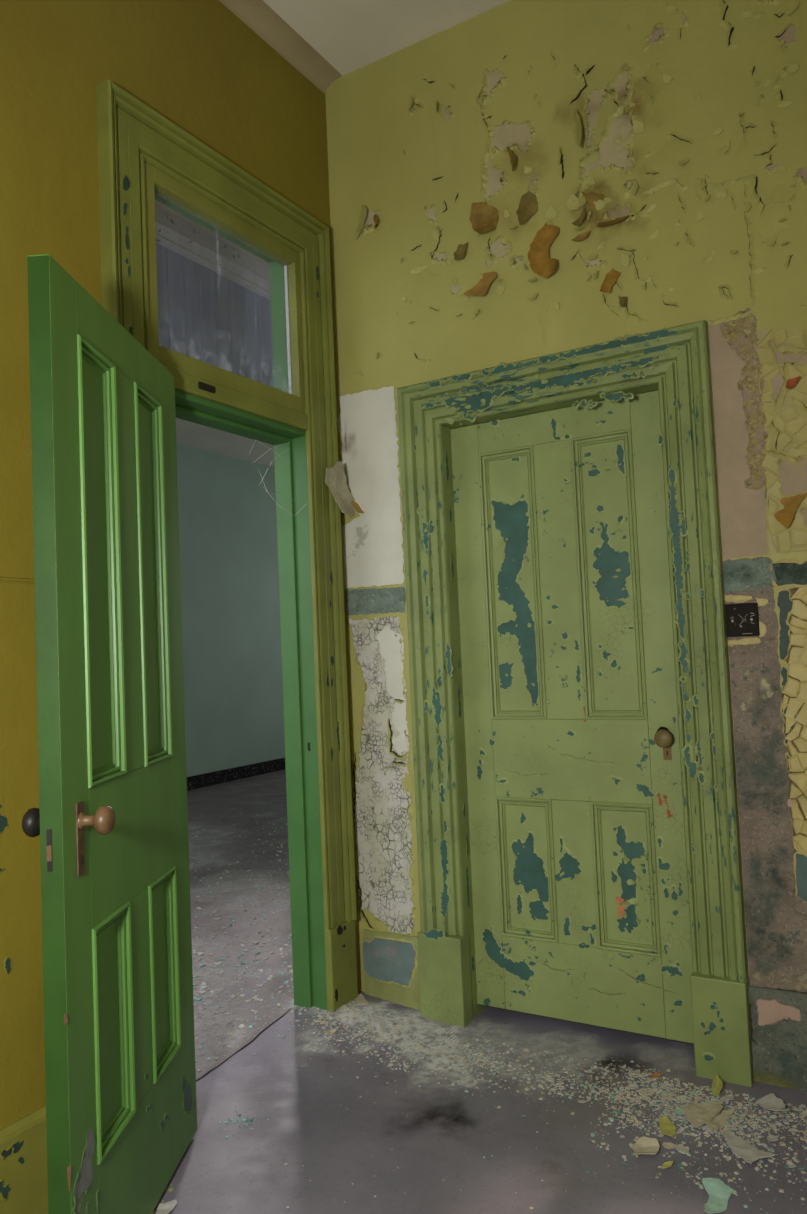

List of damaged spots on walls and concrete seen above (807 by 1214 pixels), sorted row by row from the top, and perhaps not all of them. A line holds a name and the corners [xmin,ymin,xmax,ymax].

peeling [356,204,381,240]
peeling [423,63,648,320]
crack [571,0,796,326]
peeling [420,328,679,436]
peeling [490,493,583,707]
peeling [589,505,632,609]
flaking render [708,308,807,1027]
peeling [0,803,9,837]
peeling [511,812,597,949]
peeling [610,825,684,934]
peeling [0,1139,25,1165]
peeling [67,1127,101,1214]